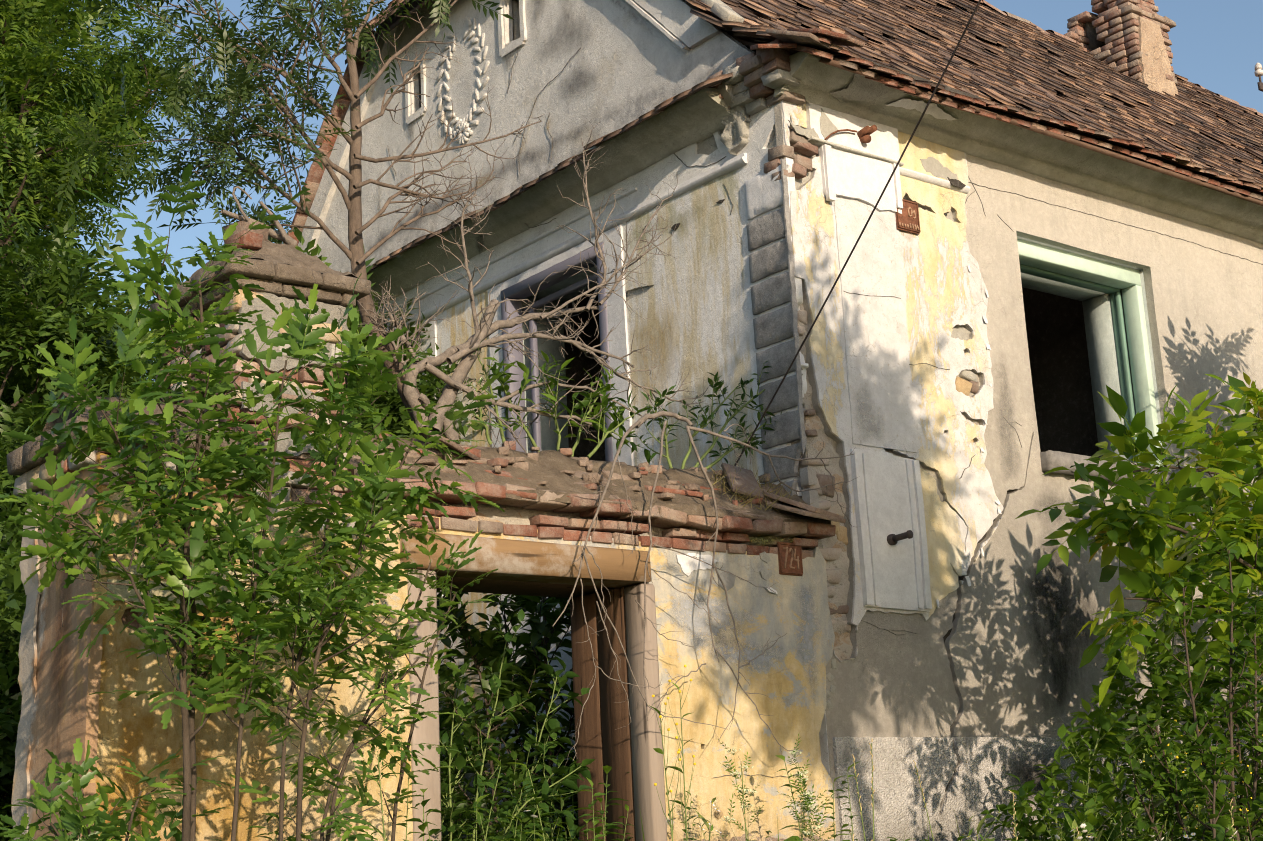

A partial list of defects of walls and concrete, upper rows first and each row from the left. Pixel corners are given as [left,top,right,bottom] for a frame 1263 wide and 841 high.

peeling [920,157,966,188]
flaking render [951,326,970,340]
flaking render [955,370,992,397]
flaking render [791,304,853,661]
peeling [676,553,736,591]
crack [861,490,1014,643]